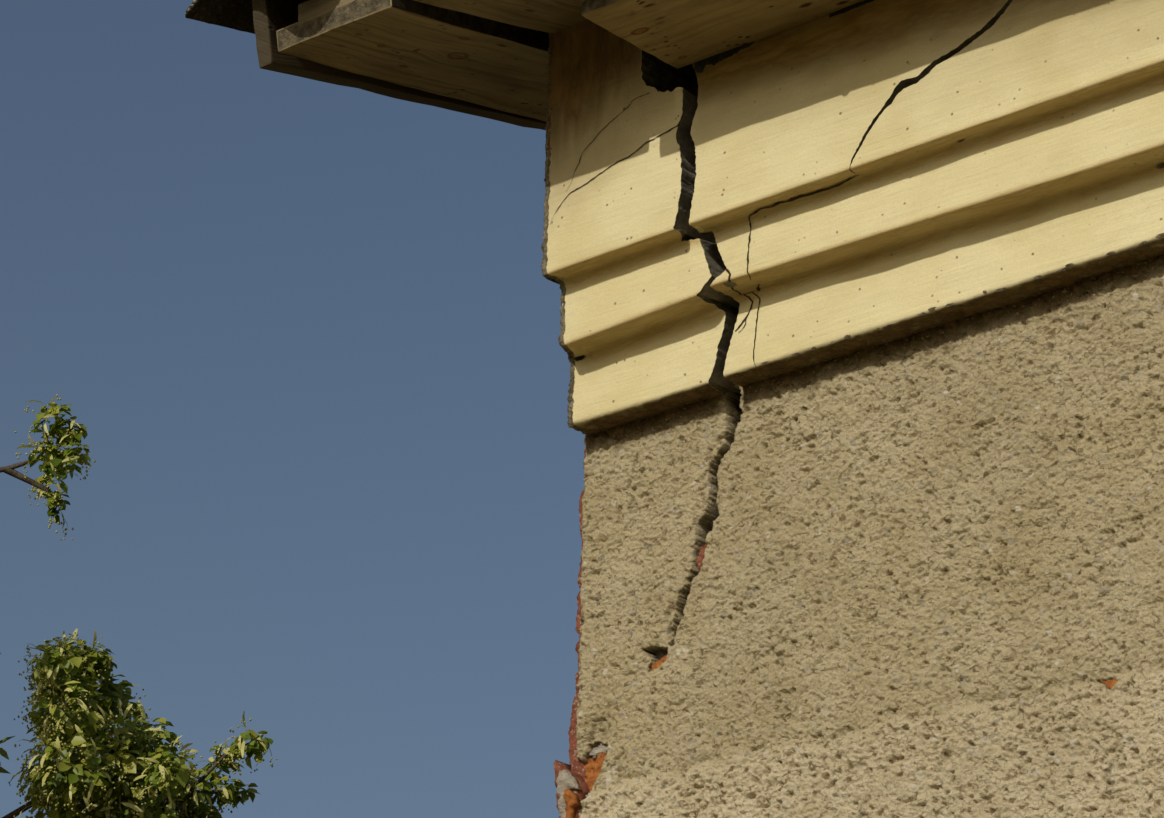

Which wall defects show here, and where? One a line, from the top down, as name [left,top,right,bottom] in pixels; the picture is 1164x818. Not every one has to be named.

crack [550,0,1013,395]
spalling [541,33,608,818]
spalling [651,651,668,671]
crack [696,544,707,572]